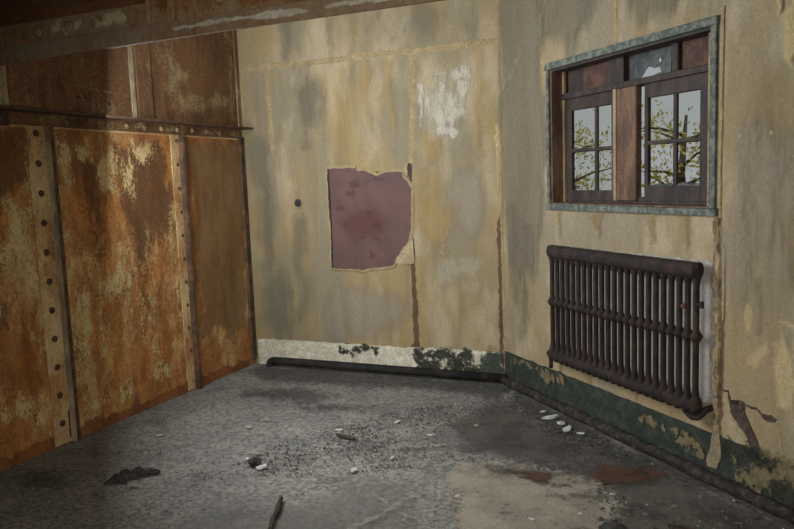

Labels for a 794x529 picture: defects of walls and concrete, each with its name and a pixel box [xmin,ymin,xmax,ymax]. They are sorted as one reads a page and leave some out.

rust [0,0,144,26]
damp [417,66,473,141]
rust [82,163,105,261]
rust [113,139,176,340]
peeling [325,162,415,274]
rust [411,264,419,347]
rust [80,359,249,438]
damp [412,345,505,382]
damp [720,435,794,509]